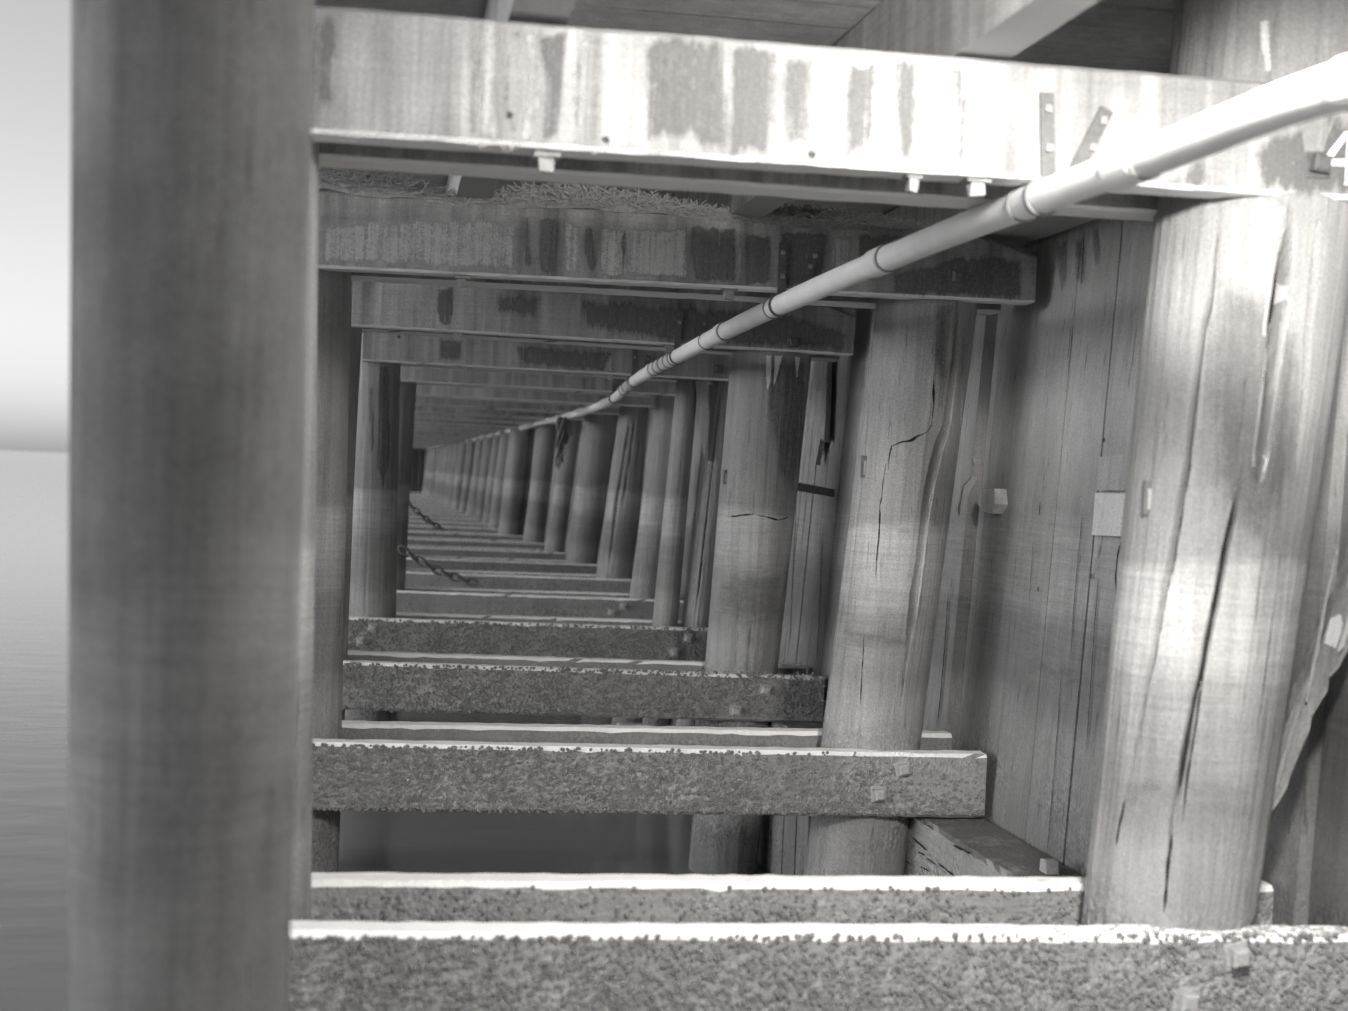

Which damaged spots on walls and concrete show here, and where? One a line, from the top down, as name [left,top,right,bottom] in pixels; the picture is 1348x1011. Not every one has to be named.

leakage [647,39,809,159]
leakage [848,64,877,149]
leakage [895,59,920,163]
leakage [319,218,903,285]
crack [876,381,935,570]
crack [1160,462,1191,632]
crack [858,638,866,699]
crack [1164,502,1234,911]
crack [1258,598,1276,722]
crack [1116,800,1125,845]